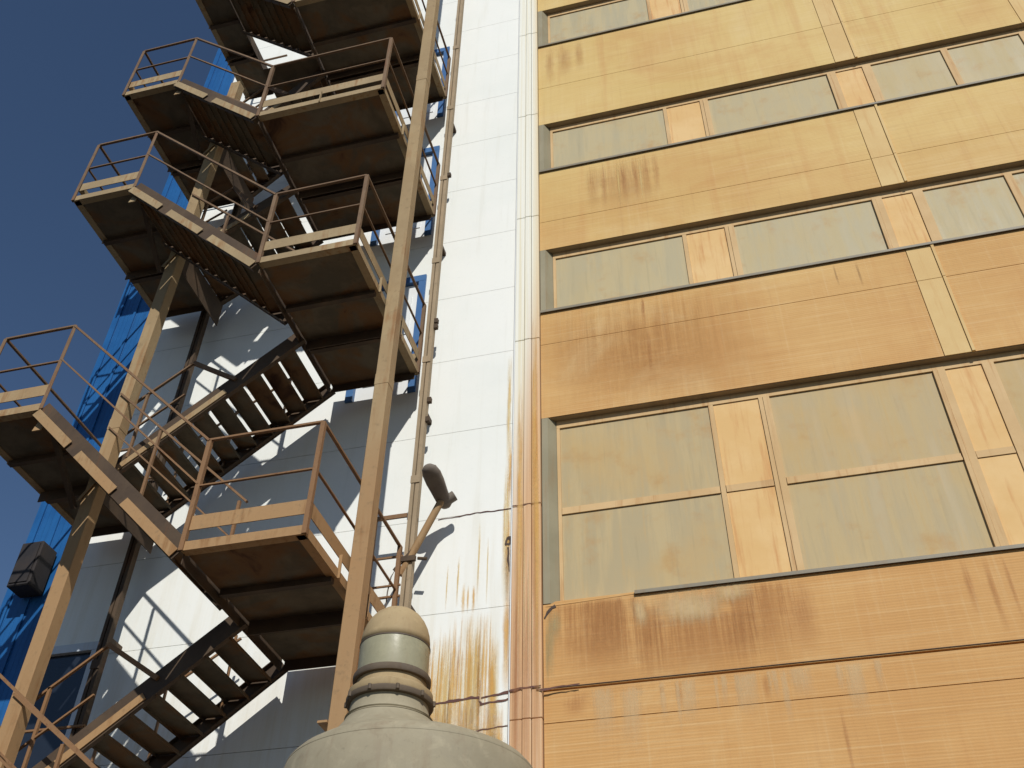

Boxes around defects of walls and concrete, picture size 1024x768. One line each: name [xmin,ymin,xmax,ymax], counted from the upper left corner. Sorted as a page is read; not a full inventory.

crack [438,502,537,520]
water stain [664,584,744,617]
corrosion [430,644,501,740]